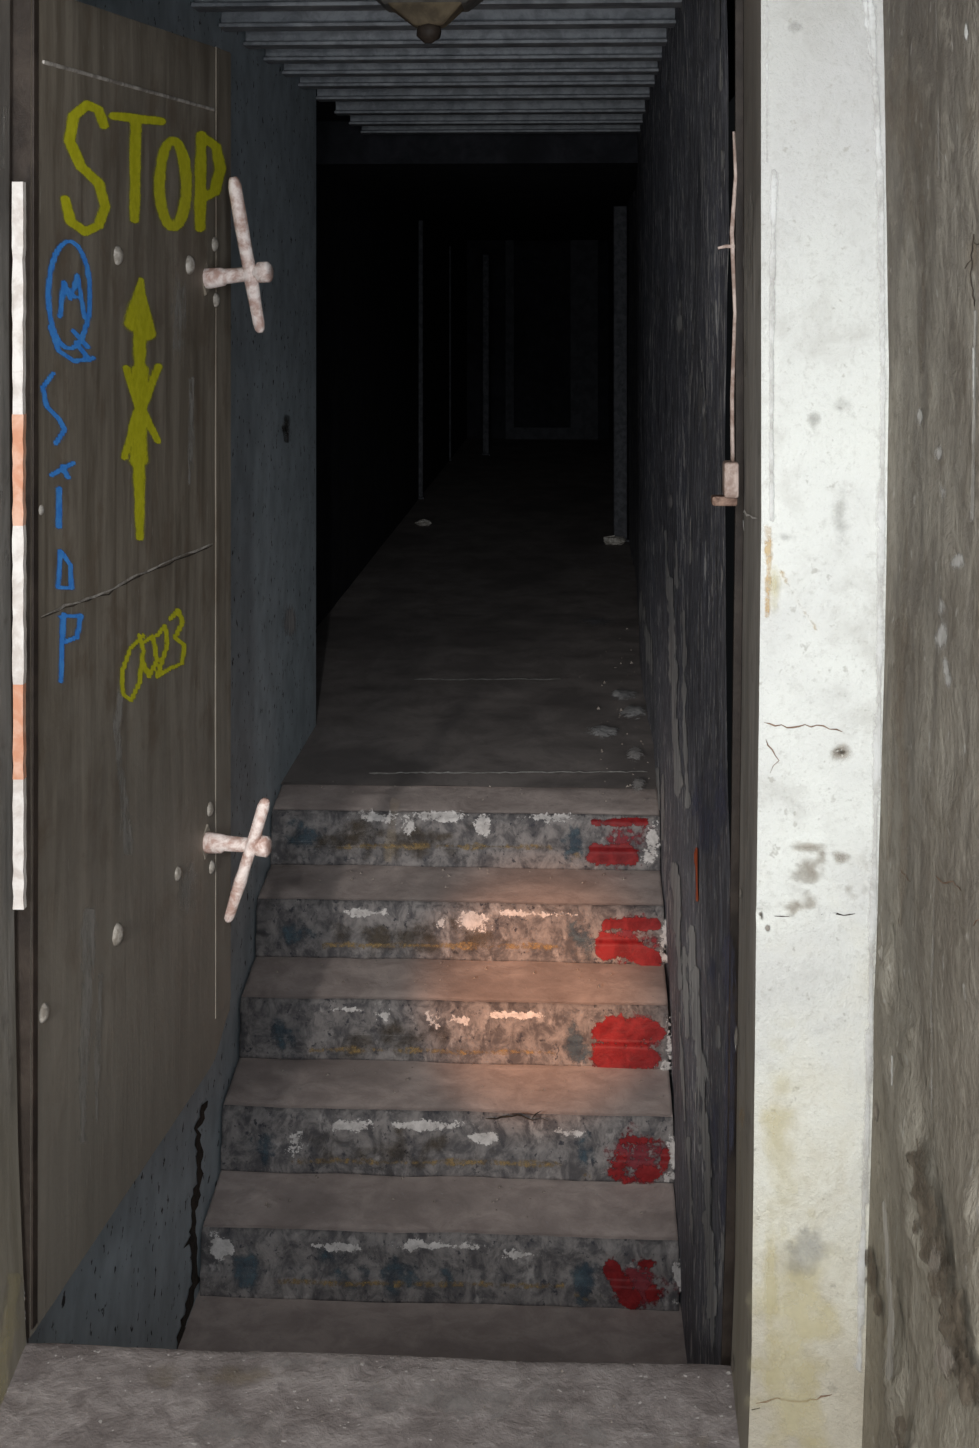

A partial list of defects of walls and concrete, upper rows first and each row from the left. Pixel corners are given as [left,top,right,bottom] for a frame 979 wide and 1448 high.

crack [764,722,842,773]
water stain [856,0,900,1379]